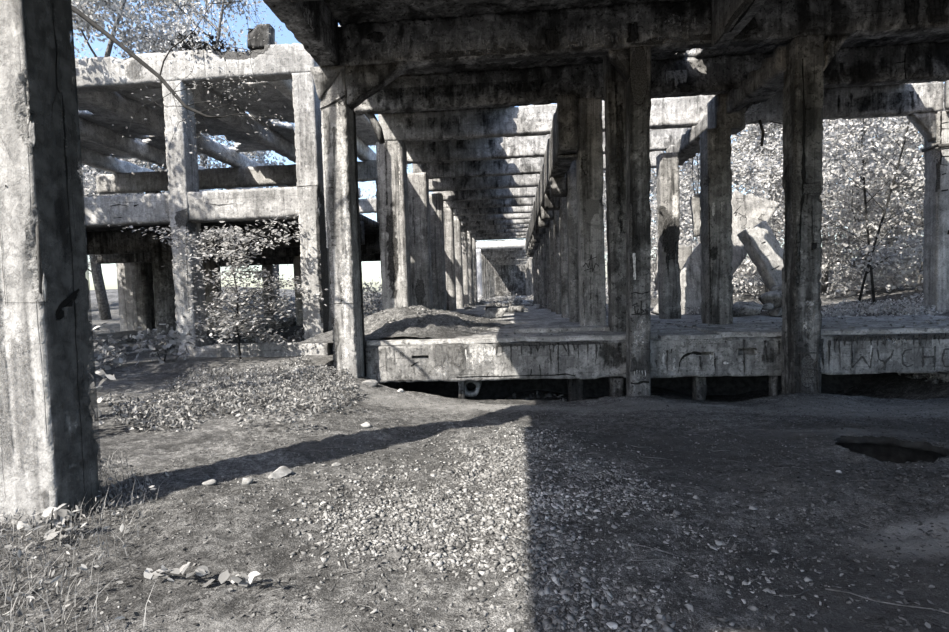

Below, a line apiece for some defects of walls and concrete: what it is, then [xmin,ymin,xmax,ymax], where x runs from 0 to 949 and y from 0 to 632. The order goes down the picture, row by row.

leakage [904,0,948,27]
leakage [626,22,639,43]
leakage [321,98,404,377]